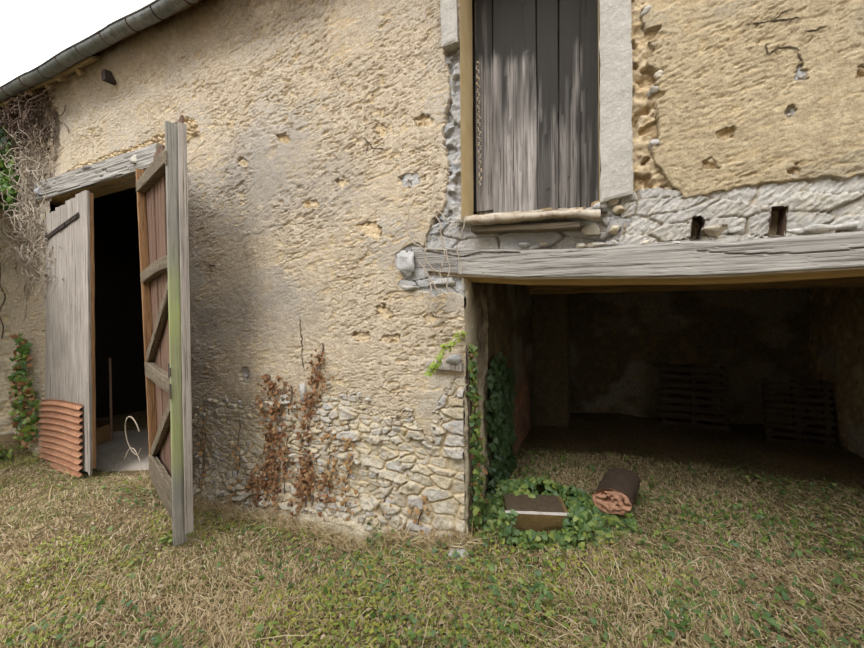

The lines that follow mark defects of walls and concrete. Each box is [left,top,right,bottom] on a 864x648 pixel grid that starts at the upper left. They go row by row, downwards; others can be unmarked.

spalling [716,129,734,141]
spalling [702,158,716,170]
flaking render [395,163,864,298]